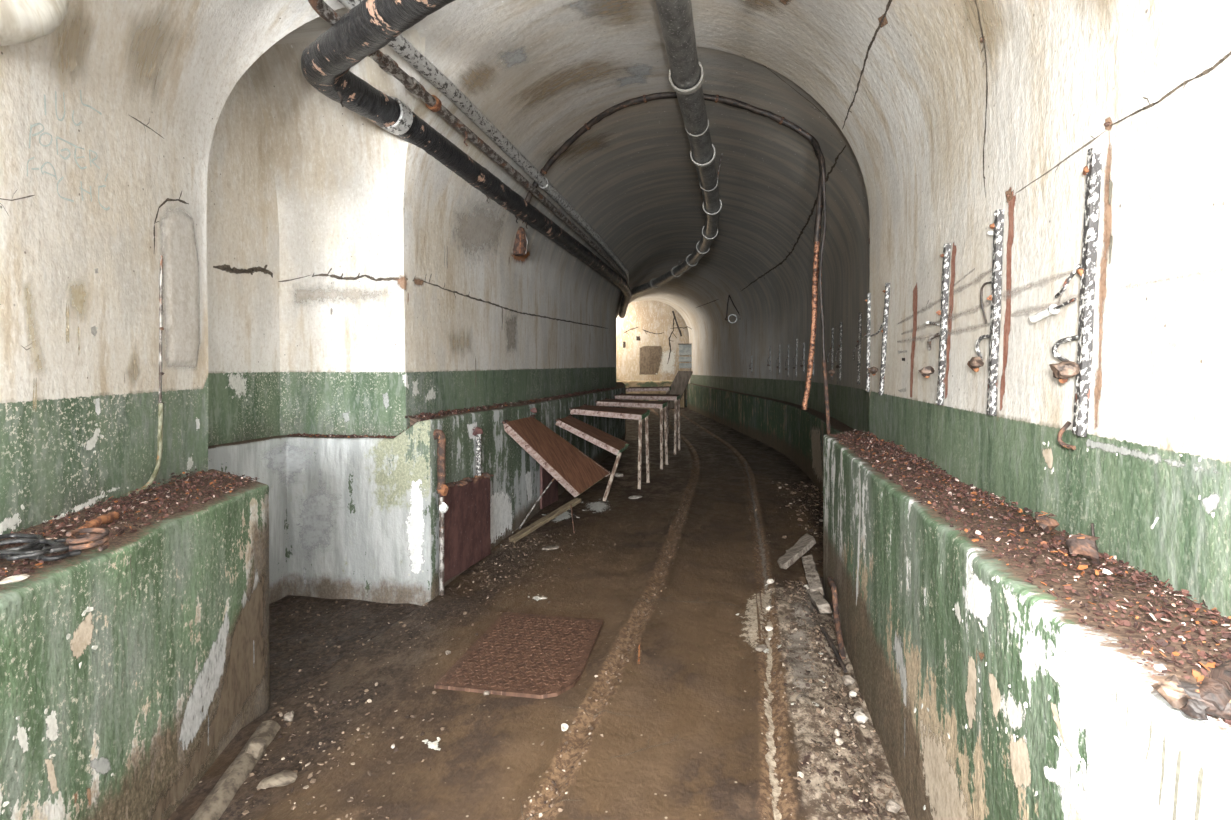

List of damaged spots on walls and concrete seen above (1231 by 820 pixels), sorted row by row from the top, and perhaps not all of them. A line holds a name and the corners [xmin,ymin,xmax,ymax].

crack [974,0,988,197]
crack [1015,51,1231,194]
crack [0,189,34,214]
crack [213,0,892,364]
corrosion [1000,188,1016,411]
corrosion [1094,117,1113,428]
peeling [0,504,25,535]
peeling [43,487,129,522]
peeling [66,607,98,668]
peeling [953,568,1023,632]
peeling [13,708,59,794]
peeling [914,703,972,820]